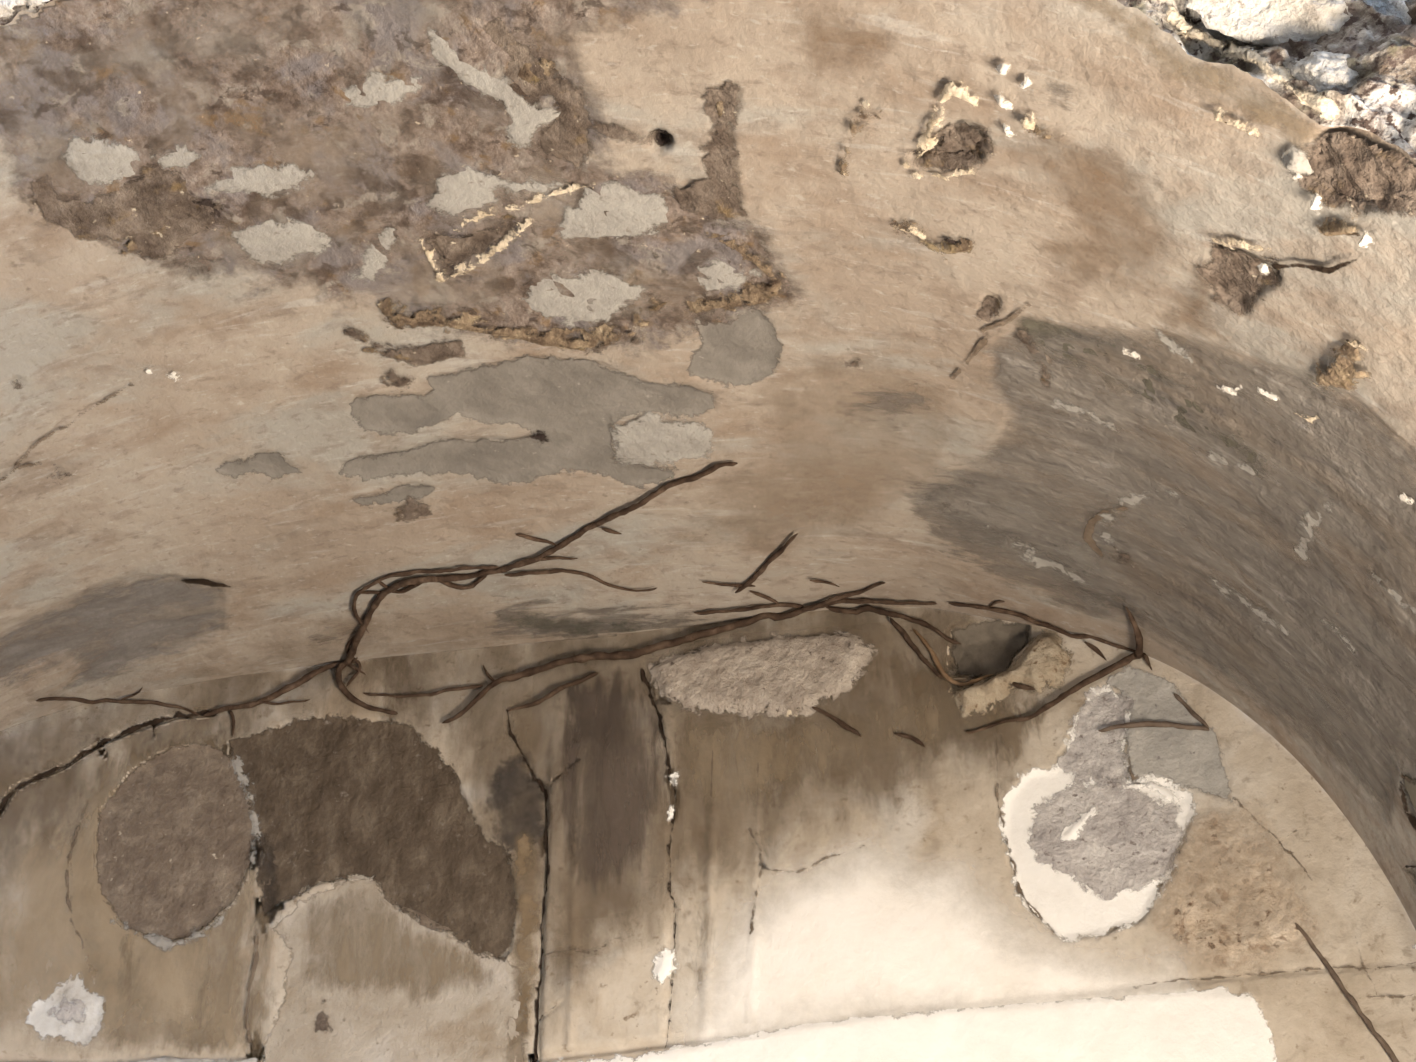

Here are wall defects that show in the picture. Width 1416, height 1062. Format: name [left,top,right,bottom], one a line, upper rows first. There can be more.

flaking render [0,0,796,523]
water stain [912,493,1118,616]
flaking render [925,296,1416,810]
crack [65,804,88,944]
crack [0,710,216,814]
flaking render [96,714,517,962]
crack [506,710,606,1062]
water stain [562,679,659,885]
peeling [648,631,878,720]
water stain [687,661,951,803]
water stain [991,703,1044,758]
flaking render [997,684,1315,968]